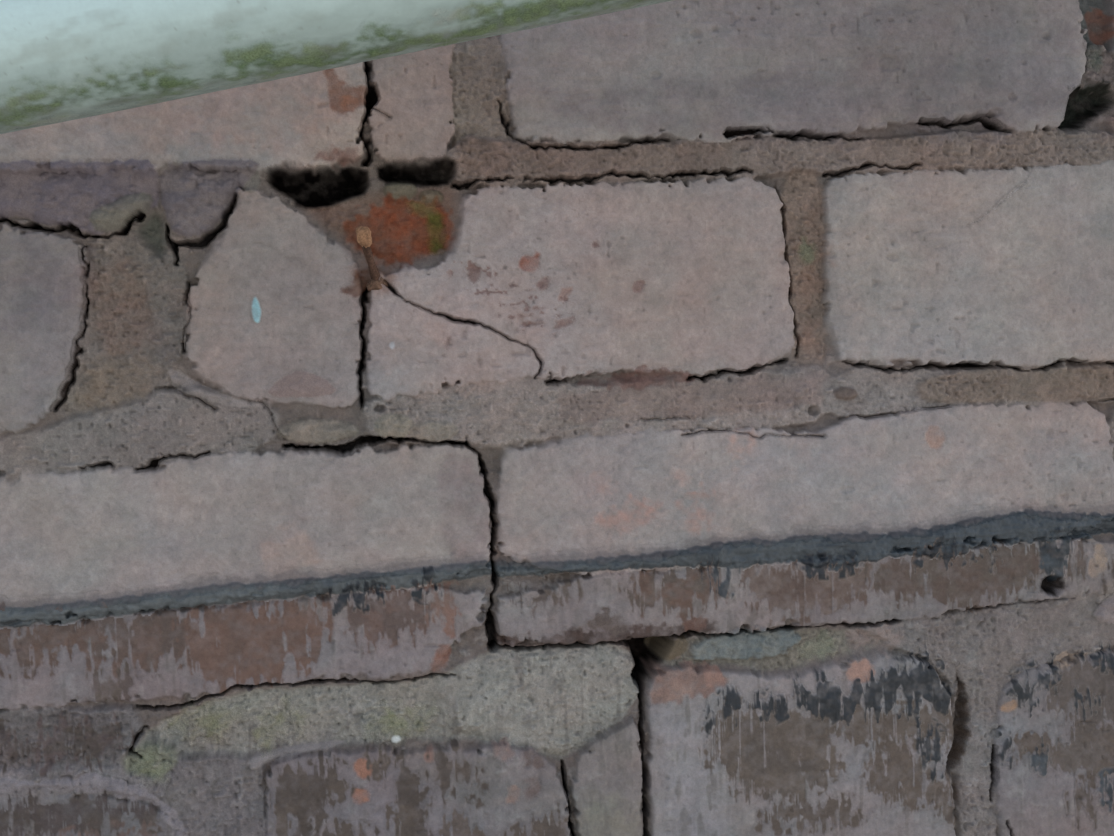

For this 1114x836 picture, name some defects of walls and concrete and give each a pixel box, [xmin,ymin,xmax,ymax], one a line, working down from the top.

crack [357,61,393,166]
rust [346,250,401,299]
crack [356,279,544,409]
crack [256,398,500,653]
peeling [0,580,463,836]
crack [561,760,577,836]
crack [630,656,651,836]
damp [698,683,791,747]
peeling [493,540,1114,836]
damp [904,716,949,786]